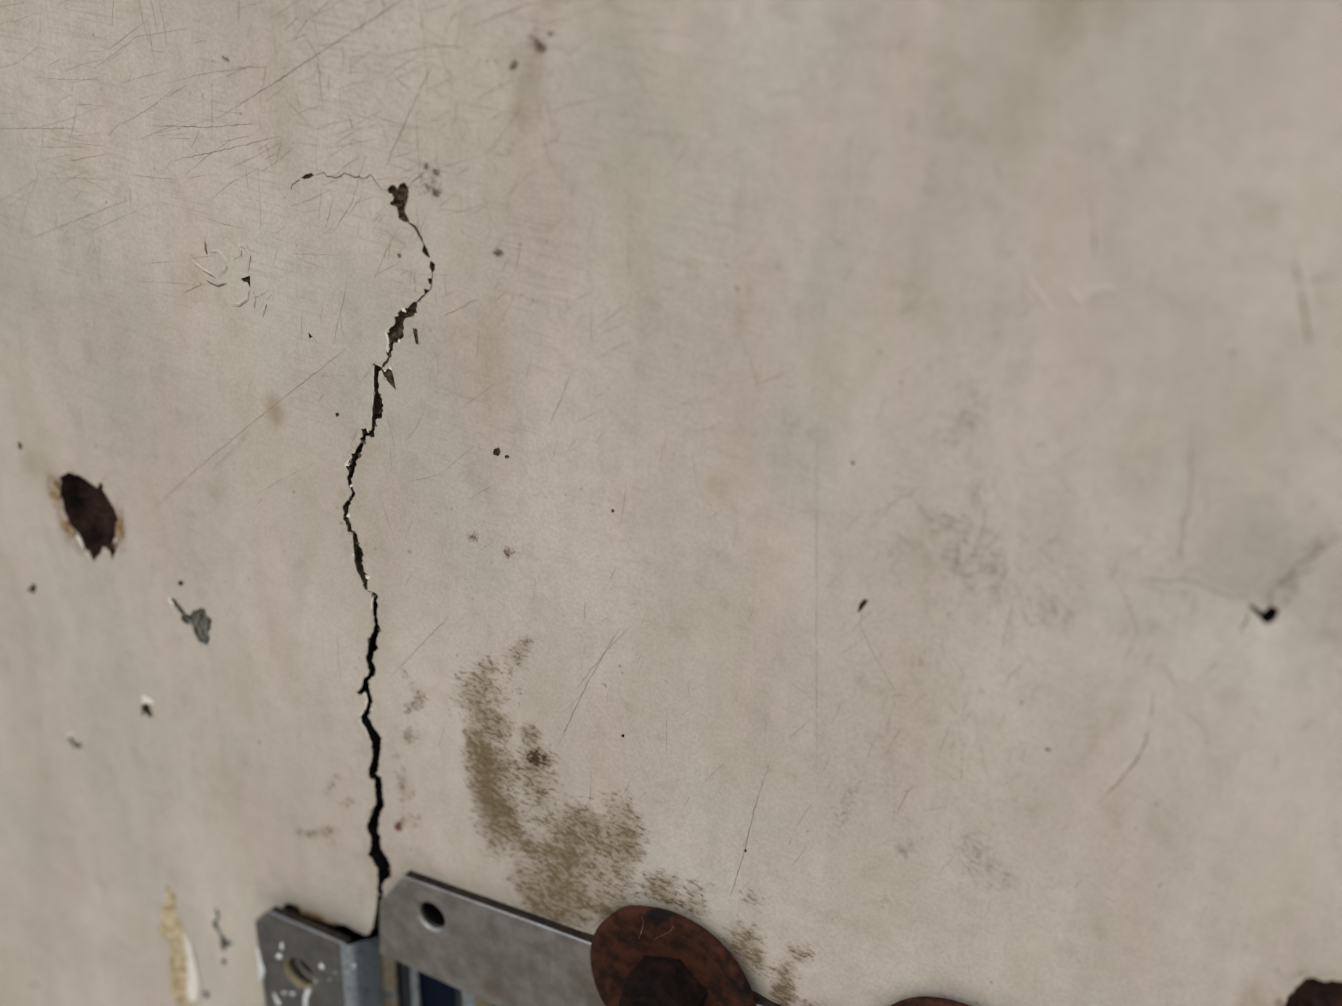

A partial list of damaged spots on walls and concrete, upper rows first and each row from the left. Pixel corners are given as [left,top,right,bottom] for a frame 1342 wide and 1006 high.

peeling [50,480,61,499]
peeling [60,521,93,562]
peeling [113,520,124,548]
crack [291,172,435,895]
peeling [168,580,212,645]
water stain [455,657,706,928]
water stain [724,929,812,1006]